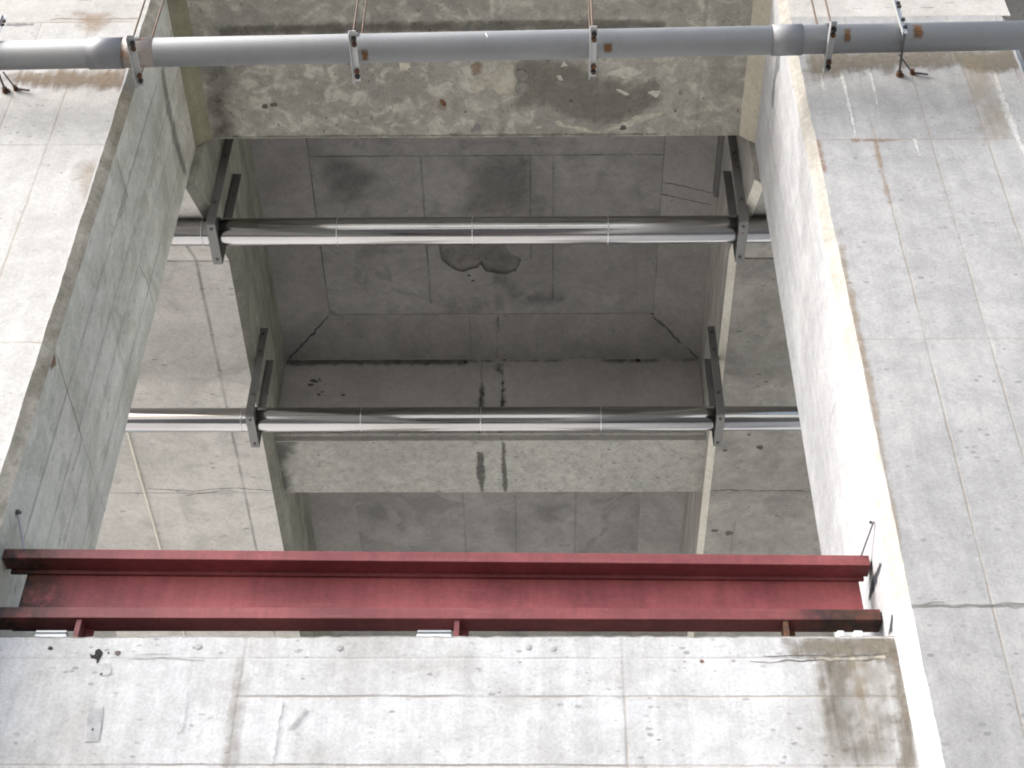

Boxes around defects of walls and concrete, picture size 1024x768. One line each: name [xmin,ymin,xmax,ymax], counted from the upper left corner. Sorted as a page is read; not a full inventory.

damp [517,60,664,133]
damp [477,452,485,492]
damp [868,564,881,600]
crack [910,600,1024,608]
crack [752,653,890,663]
damp [796,615,915,768]